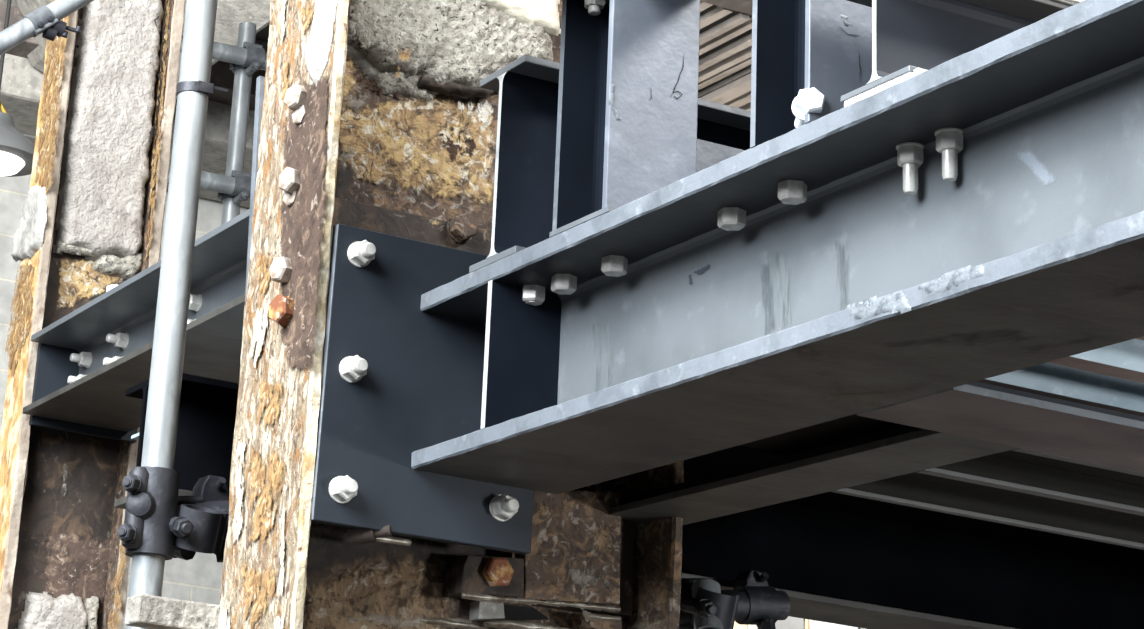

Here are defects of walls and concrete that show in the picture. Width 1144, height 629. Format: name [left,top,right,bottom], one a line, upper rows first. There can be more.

rust [255,49,494,370]
peeling [251,300,271,367]
peeling [847,290,911,321]
peeling [918,264,984,295]
rust [257,378,282,430]
peeling [233,442,245,544]
peeling [277,484,287,596]
peeling [218,602,230,629]